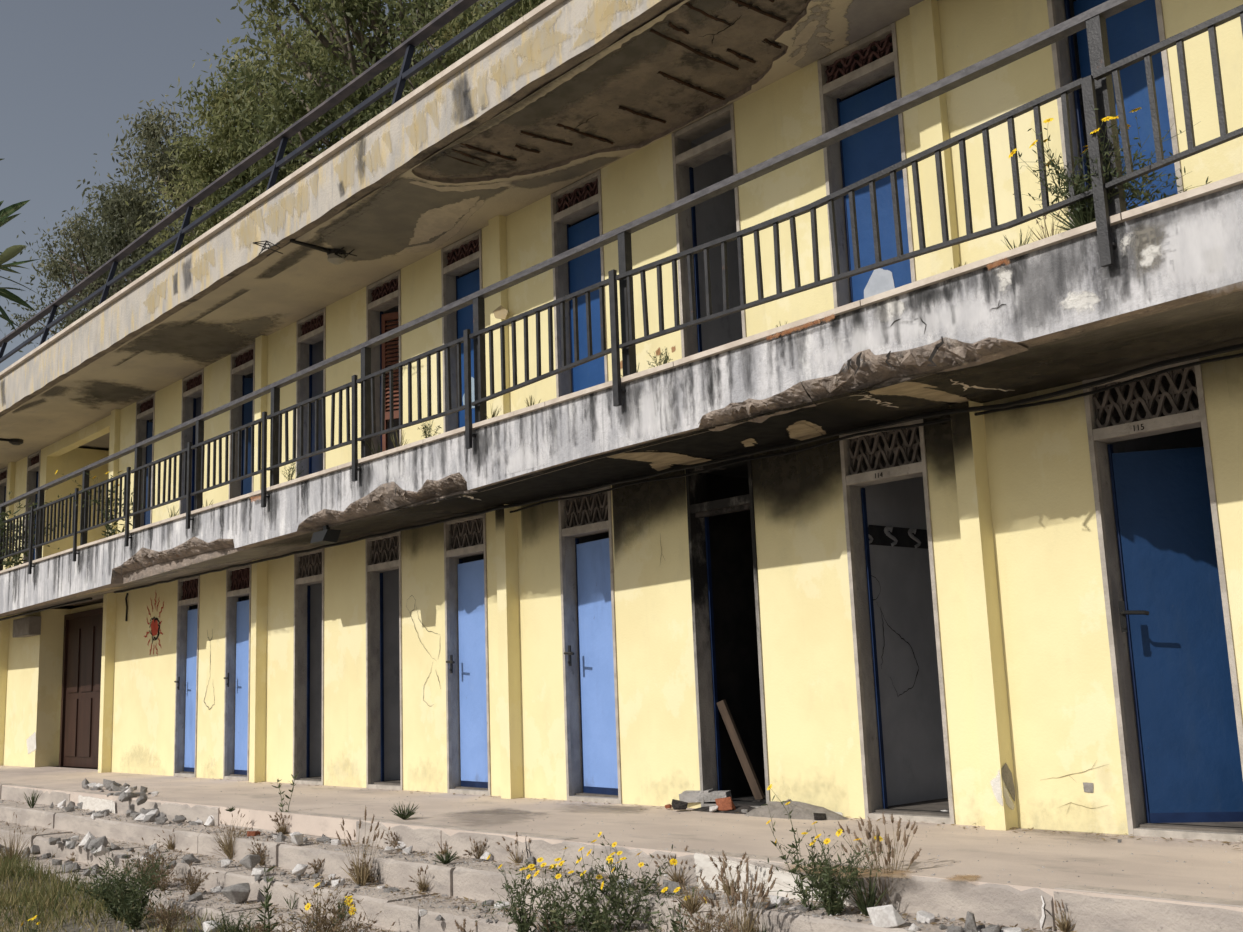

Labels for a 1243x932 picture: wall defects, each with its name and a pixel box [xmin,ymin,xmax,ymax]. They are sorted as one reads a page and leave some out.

leakage [425,80,546,164]
spalling [317,0,807,261]
leakage [983,243,1082,321]
leakage [1096,209,1183,298]
leakage [608,386,643,422]
spalling [698,267,1028,441]
leakage [824,312,1243,418]
spalling [299,458,467,529]
leakage [8,522,170,600]
spalling [112,537,234,574]
peeling [991,763,1015,810]
crack [1043,762,1108,812]